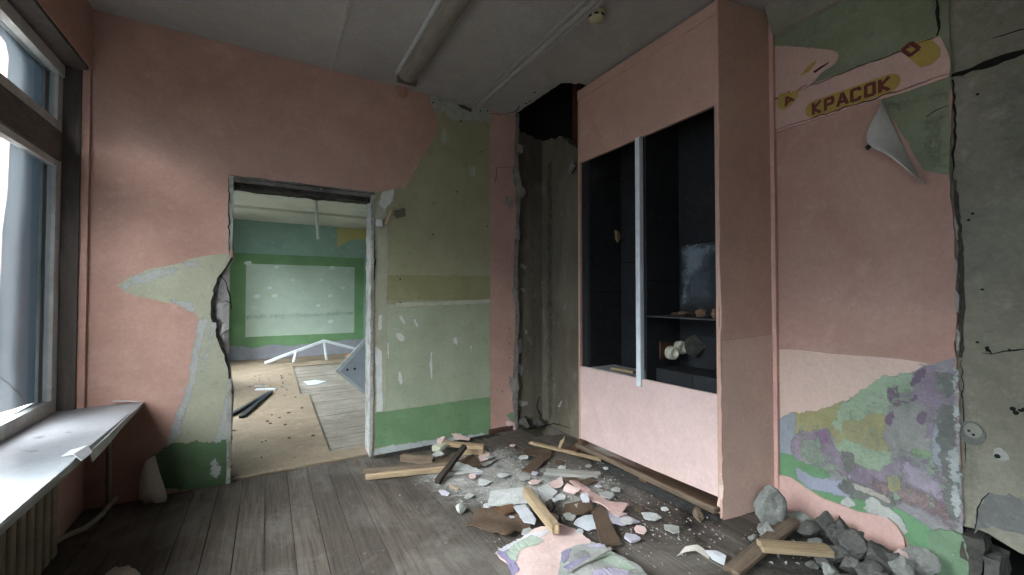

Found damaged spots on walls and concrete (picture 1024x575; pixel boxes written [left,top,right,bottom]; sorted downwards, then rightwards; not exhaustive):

peeling [775,0,952,175]
crack [950,79,958,180]
peeling [116,111,490,491]
spalling [507,83,587,429]
peeling [780,358,1024,575]